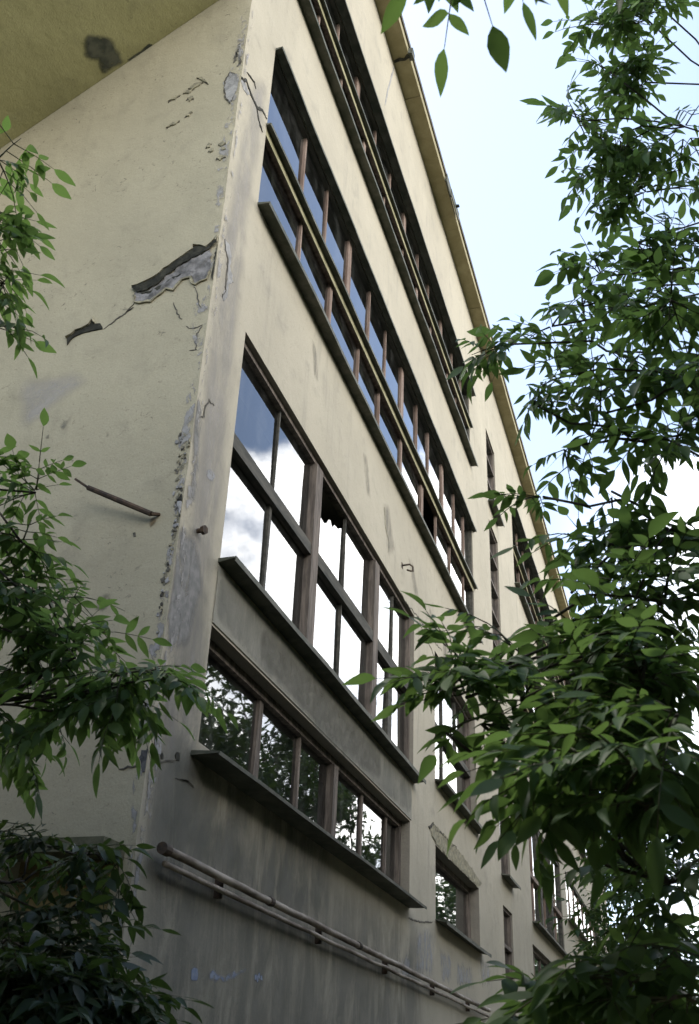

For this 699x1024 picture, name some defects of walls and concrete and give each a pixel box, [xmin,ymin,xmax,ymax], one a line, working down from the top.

damp [86,36,152,72]
peeling [166,77,209,129]
crack [223,43,267,133]
flaking render [104,235,234,329]
crack [173,287,202,351]
flaking render [156,400,215,644]